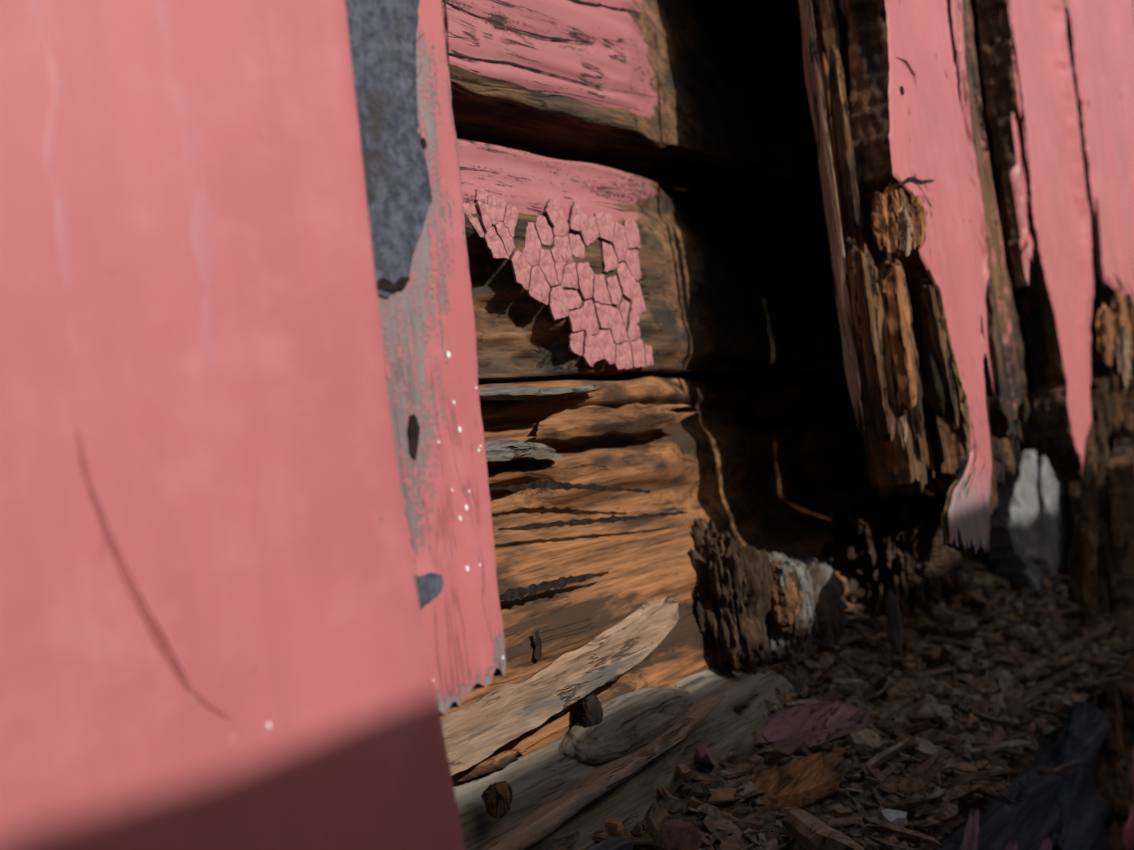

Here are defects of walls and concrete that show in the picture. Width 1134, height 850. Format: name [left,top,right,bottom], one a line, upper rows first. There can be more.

peeling [345,0,432,297]
peeling [463,188,654,370]
crack [78,429,231,718]
peeling [414,572,443,611]